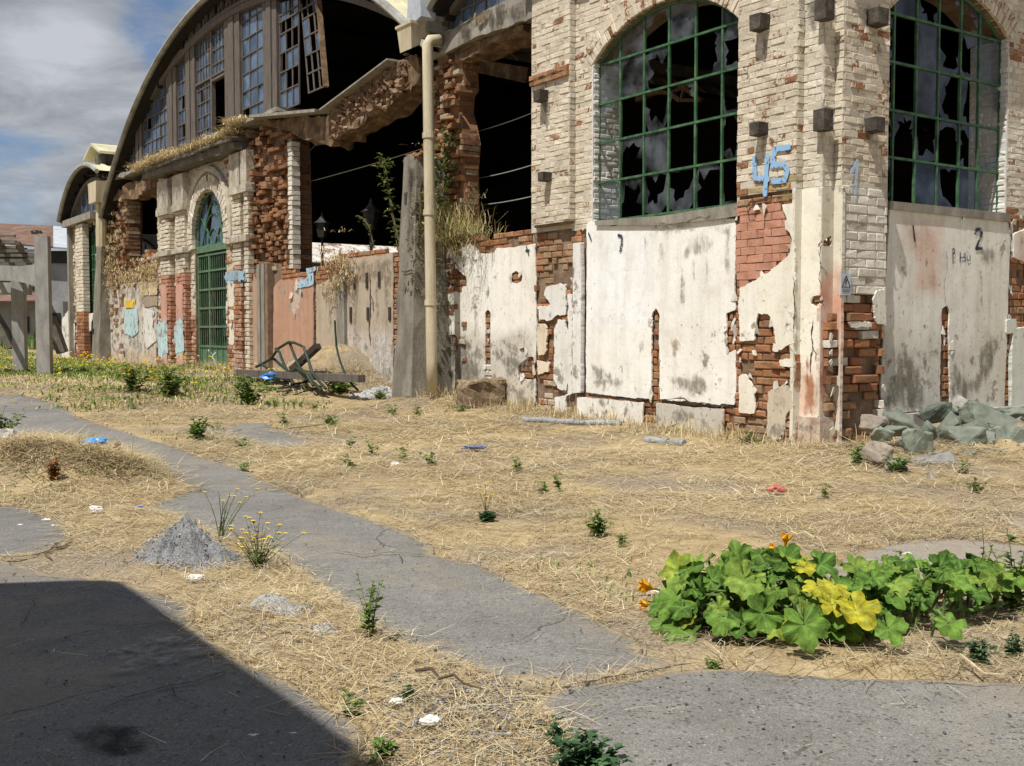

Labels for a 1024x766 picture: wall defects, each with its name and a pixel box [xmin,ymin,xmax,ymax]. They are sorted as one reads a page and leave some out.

peeling [124,279,184,359]
spalling [517,227,585,413]
water stain [672,375,706,394]
spalling [721,202,801,445]
spalling [810,295,886,442]
water stain [887,347,923,404]
water stain [954,341,998,398]
spalling [1007,215,1024,321]